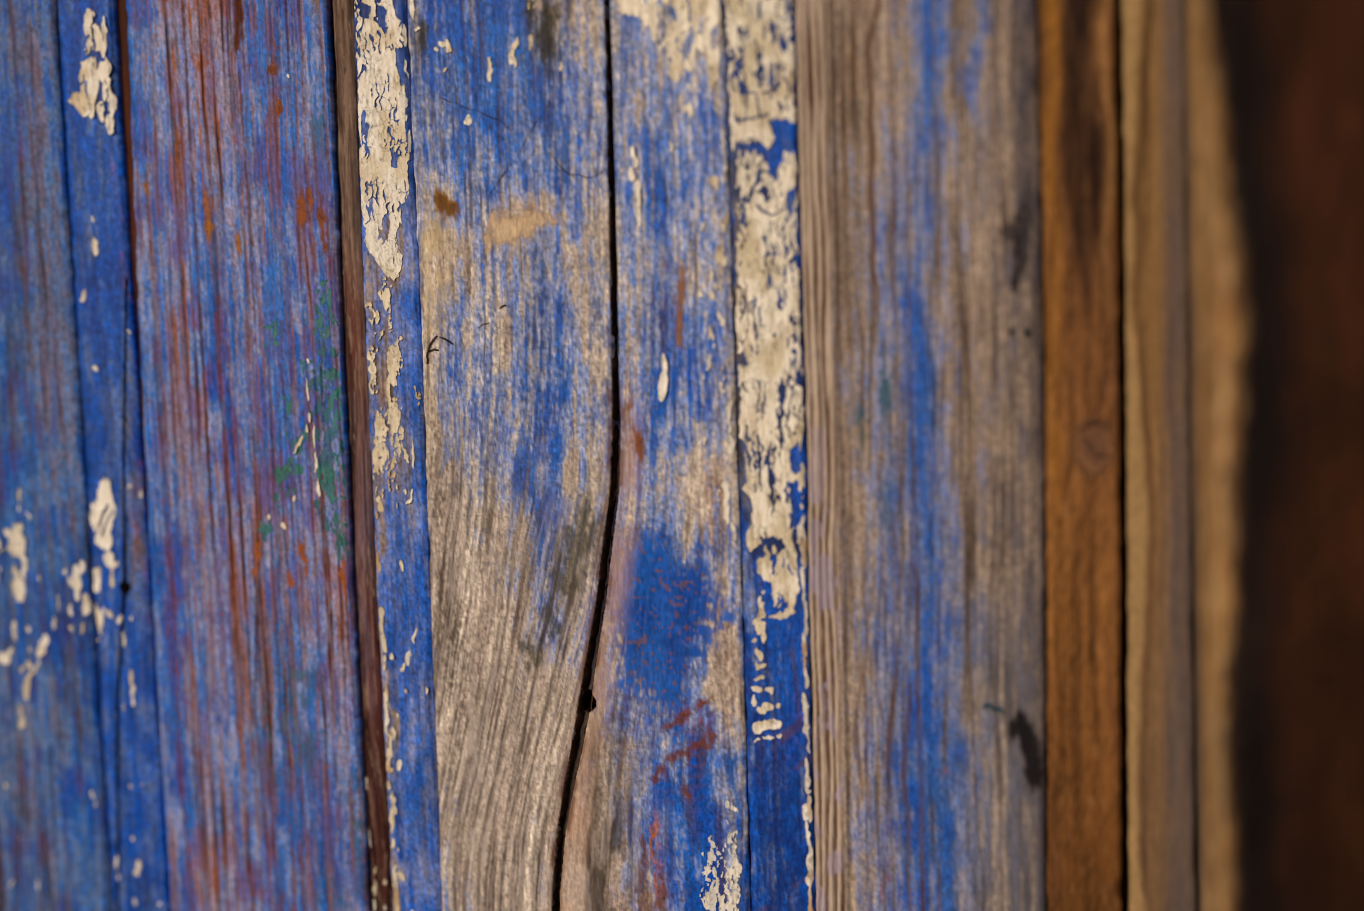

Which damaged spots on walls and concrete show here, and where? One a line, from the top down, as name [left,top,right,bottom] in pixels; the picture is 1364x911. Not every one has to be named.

peeling [68,8,118,135]
peeling [434,39,452,72]
peeling [508,34,533,68]
peeling [354,0,420,585]
crack [445,0,621,911]
peeling [618,0,814,911]
peeling [0,477,133,729]
crack [115,279,130,911]
peeling [115,855,141,880]
peeling [123,669,136,711]
peeling [372,606,417,911]